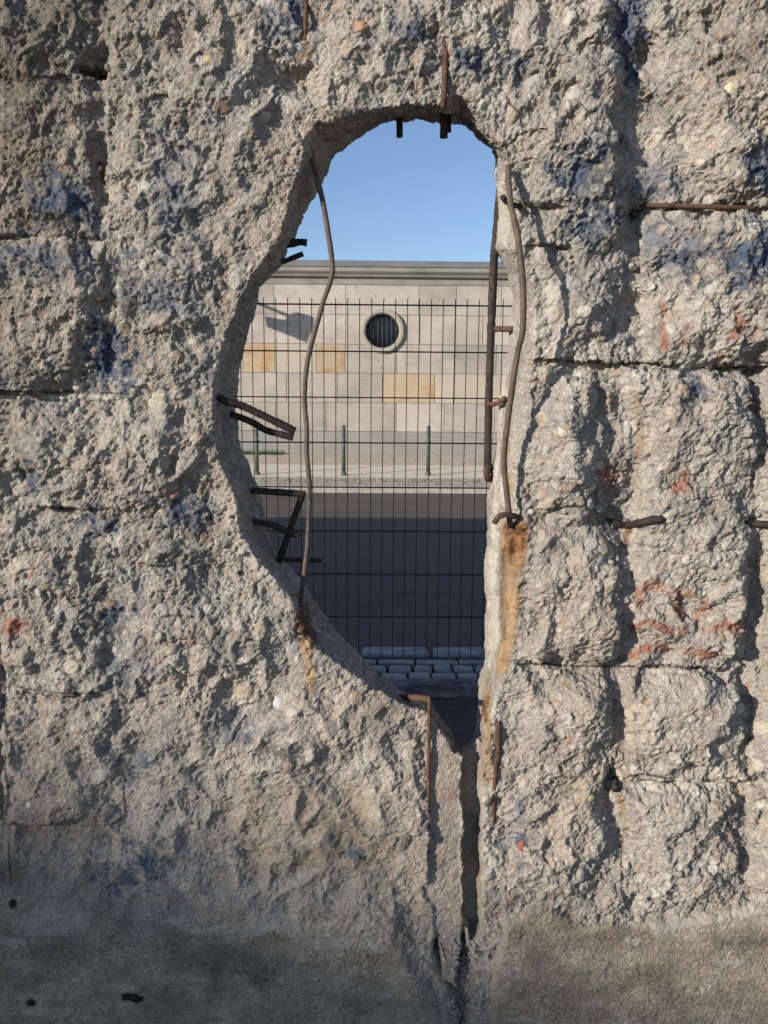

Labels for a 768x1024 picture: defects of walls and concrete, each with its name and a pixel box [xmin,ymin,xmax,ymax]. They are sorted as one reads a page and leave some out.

spalling [216,149,335,606]
corrosion [296,601,318,691]
corrosion [481,521,529,782]